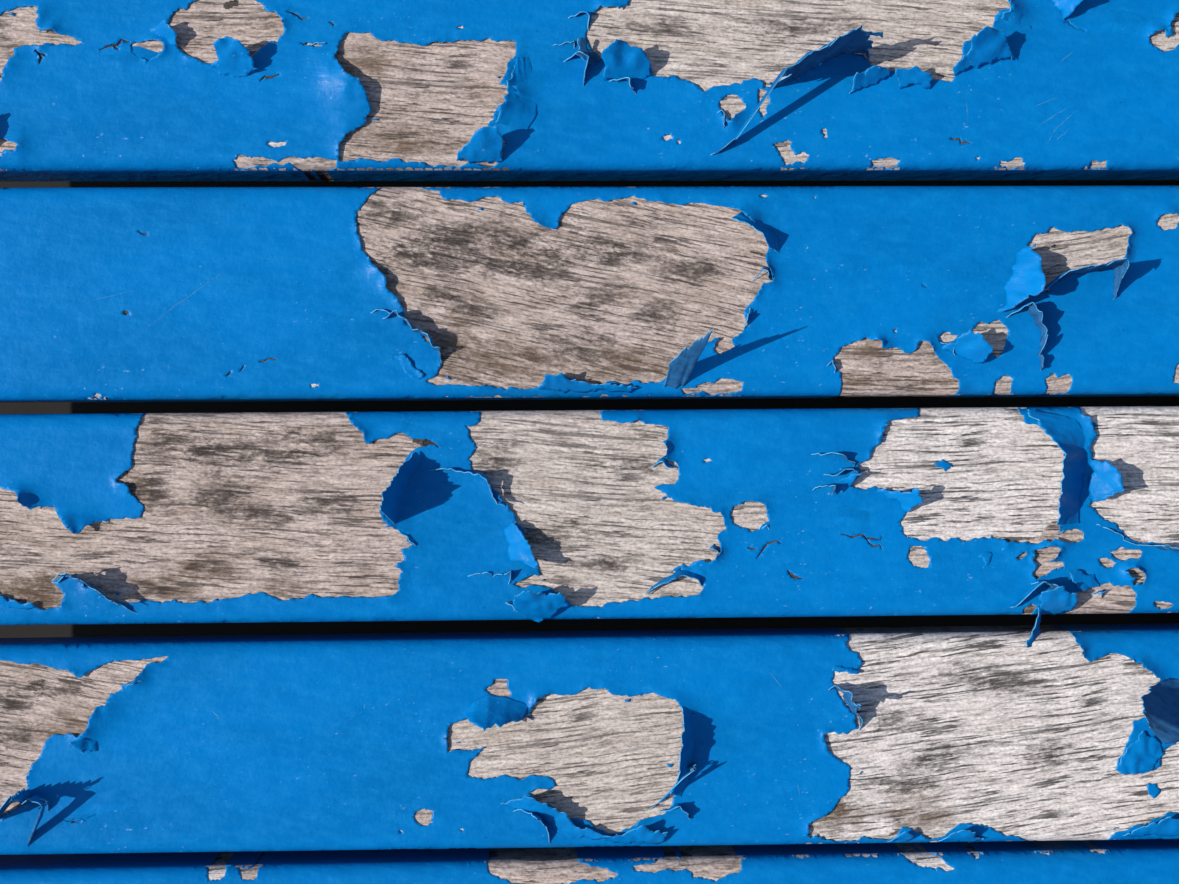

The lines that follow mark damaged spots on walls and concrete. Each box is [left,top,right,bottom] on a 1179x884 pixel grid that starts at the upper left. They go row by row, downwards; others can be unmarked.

peeling [0,138,17,171]
peeling [0,6,82,81]
peeling [132,0,284,78]
peeling [233,26,538,171]
peeling [773,140,809,170]
peeling [553,0,1031,155]
peeling [1149,12,1179,52]
peeling [0,187,779,622]
peeling [792,225,1179,871]
peeling [0,656,168,846]
peeling [446,679,745,884]